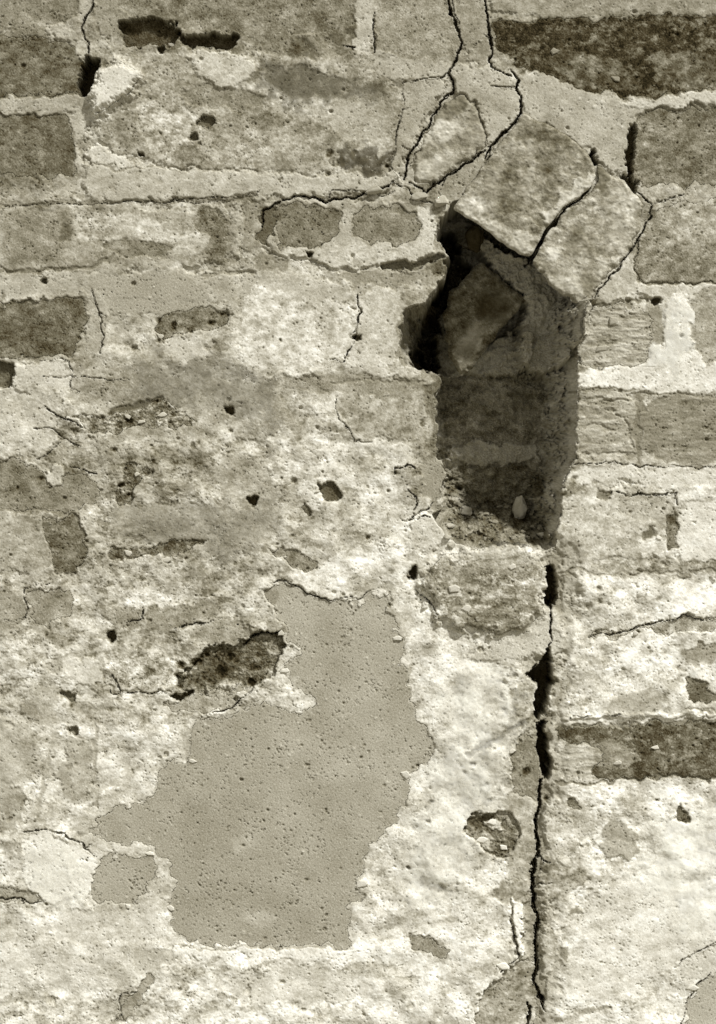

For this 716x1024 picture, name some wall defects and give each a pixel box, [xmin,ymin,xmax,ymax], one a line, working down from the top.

crack [69,0,522,227]
crack [530,189,589,260]
crack [596,190,681,295]
spalling [399,214,654,552]
flaking render [89,583,435,950]
spalling [463,811,520,858]
crack [500,779,555,1024]